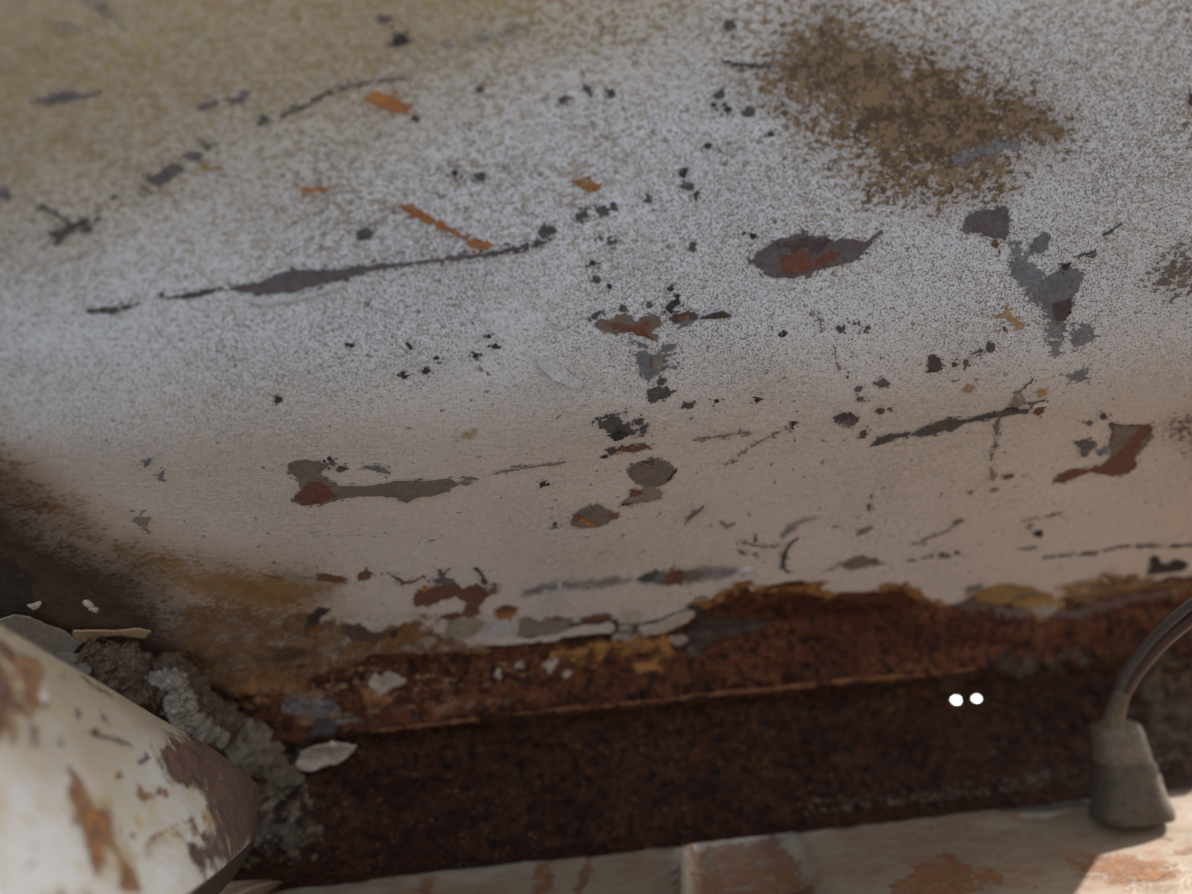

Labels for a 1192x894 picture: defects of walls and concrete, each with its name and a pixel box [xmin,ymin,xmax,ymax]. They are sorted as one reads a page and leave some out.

peeling [81,298,143,315]
peeling [159,224,560,306]
rust [399,203,492,254]
peeling [571,202,619,225]
peeling [741,227,883,279]
peeling [959,205,1101,359]
peeling [1060,368,1090,385]
peeling [548,285,732,529]
peeling [1053,411,1157,485]
peeling [286,456,478,508]
rust [954,572,1192,622]
peeling [252,555,1192,771]